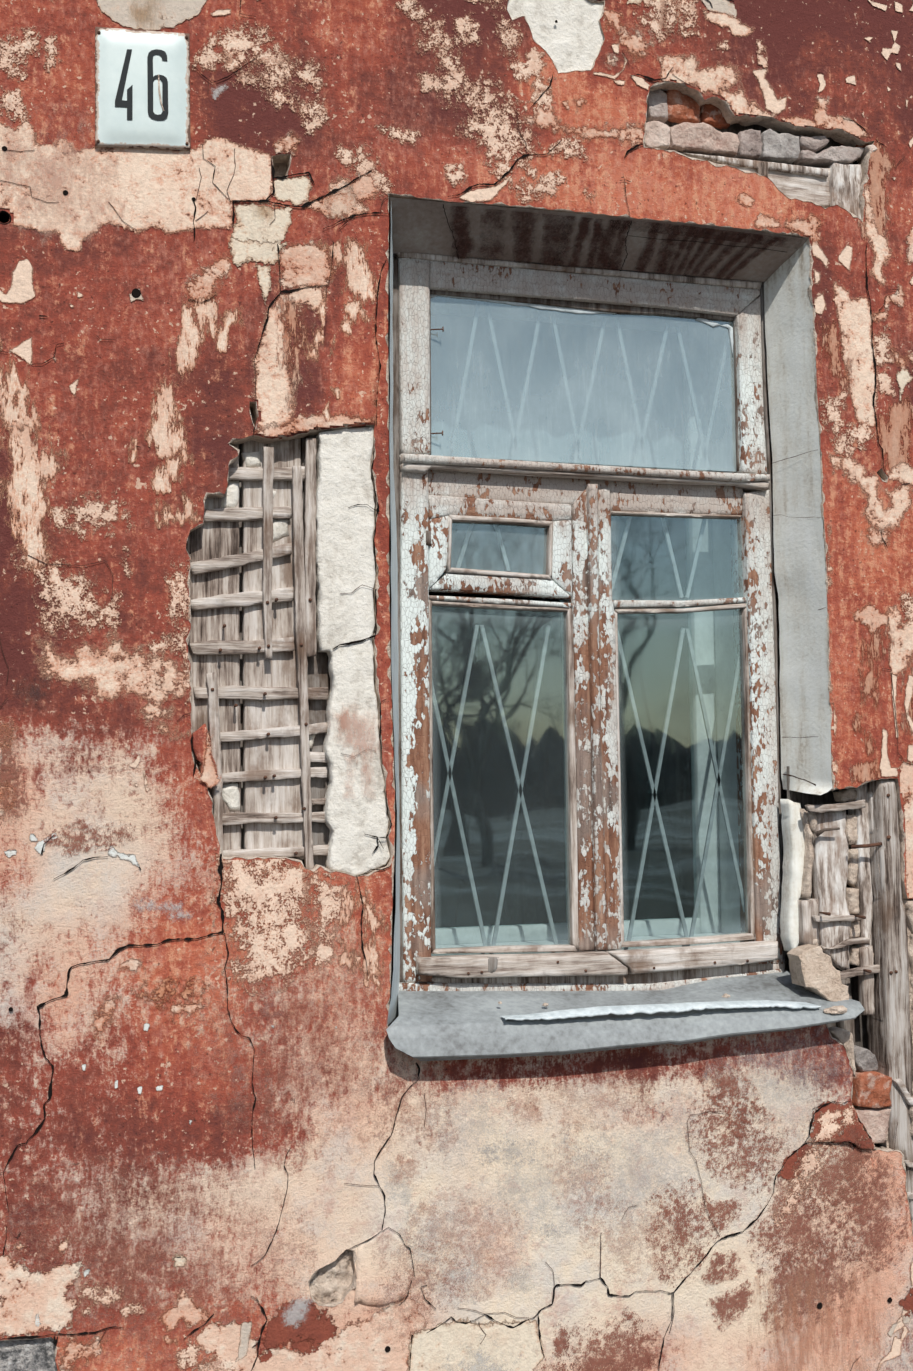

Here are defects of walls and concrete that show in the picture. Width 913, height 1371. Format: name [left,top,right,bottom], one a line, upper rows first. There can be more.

peeling [0,0,913,1038]
crack [866,246,911,485]
crack [41,835,108,879]
crack [887,669,913,765]
crack [0,853,291,1371]
peeling [0,1237,659,1371]
crack [344,1063,898,1371]
peeling [644,1024,913,1371]